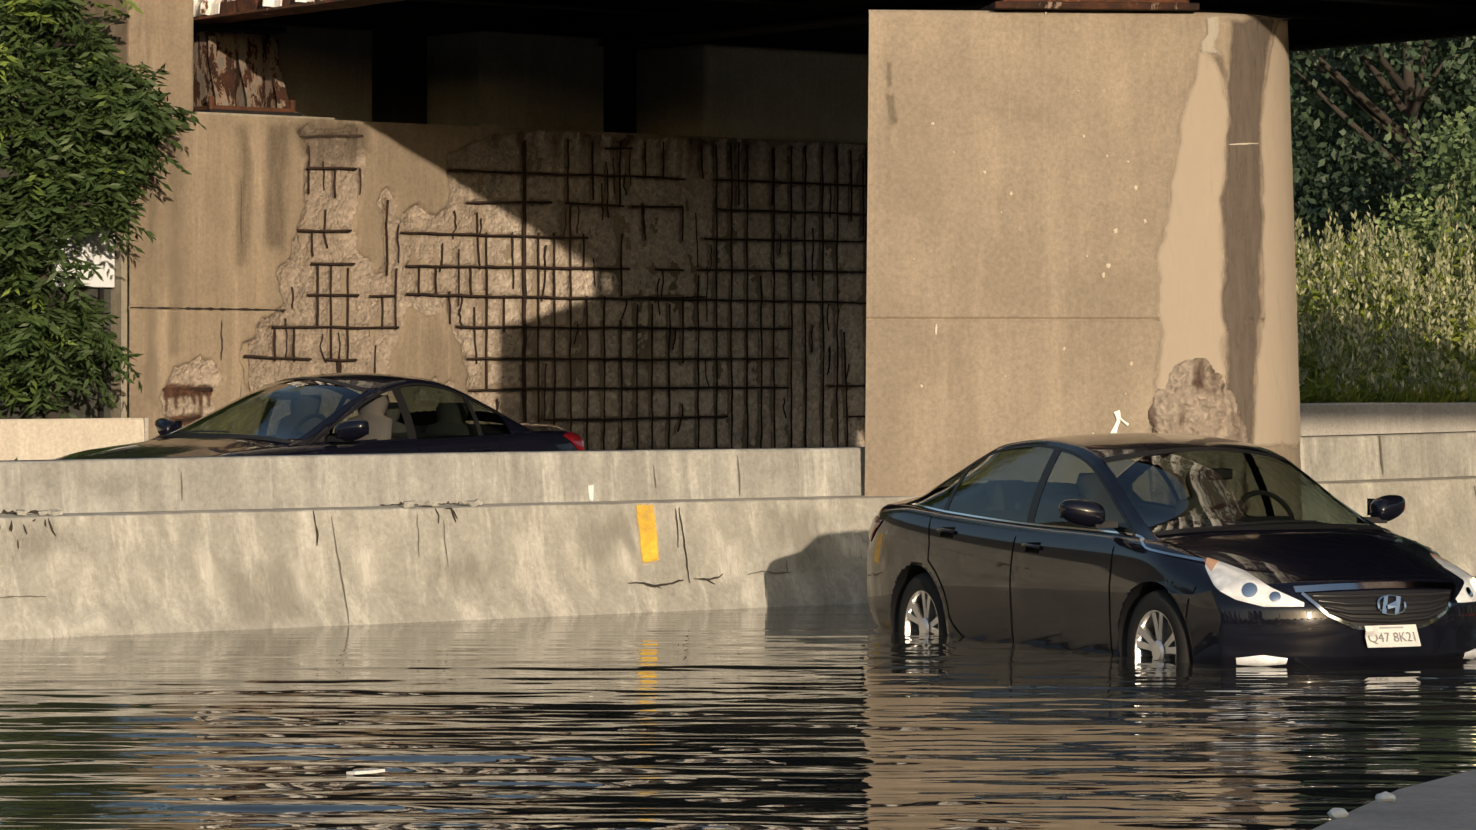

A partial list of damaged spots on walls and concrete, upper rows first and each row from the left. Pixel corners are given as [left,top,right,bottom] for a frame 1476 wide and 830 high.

spalling [160,356,223,433]
spalling [244,126,867,450]
water stain [1155,16,1301,446]